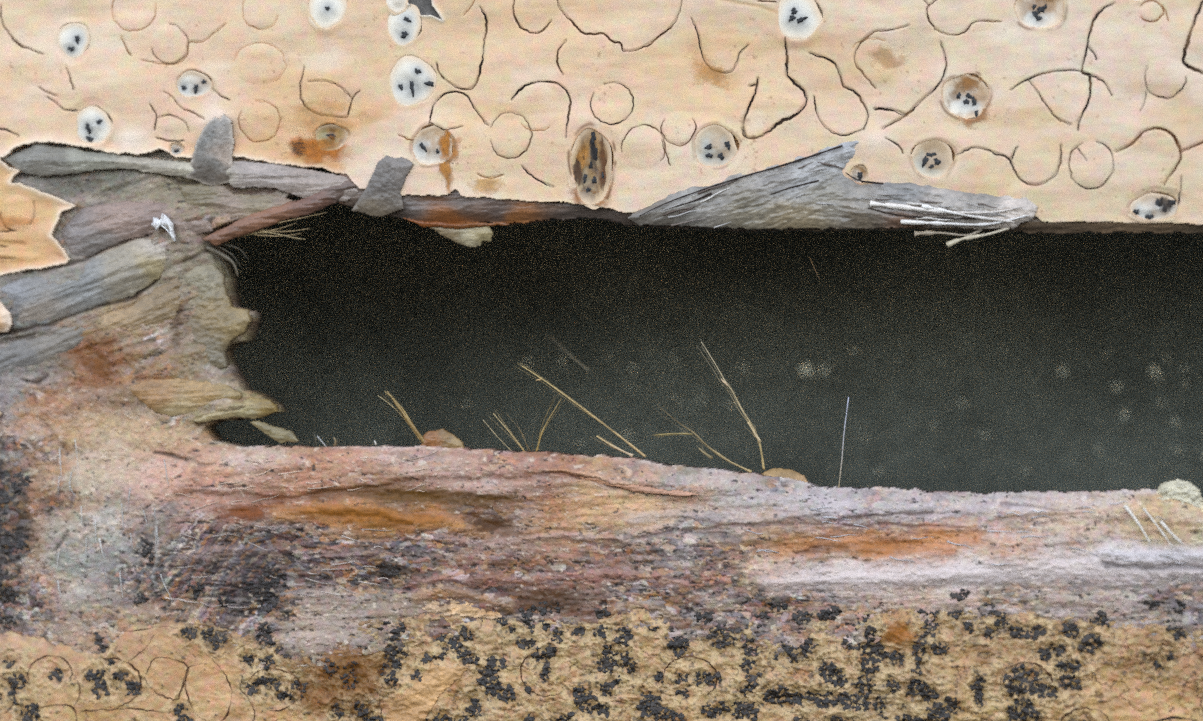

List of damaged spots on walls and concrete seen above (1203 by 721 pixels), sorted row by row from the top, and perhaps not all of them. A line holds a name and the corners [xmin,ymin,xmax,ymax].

crack [0,7,43,54]
crack [40,69,78,111]
crack [112,0,359,142]
crack [401,0,1000,187]
crack [955,0,1203,204]
rust [291,136,344,162]
rust [439,131,458,190]
rust [573,138,607,205]
crack [0,201,35,259]
peeling [427,226,494,247]
peeling [0,144,359,443]
rust [226,506,263,518]